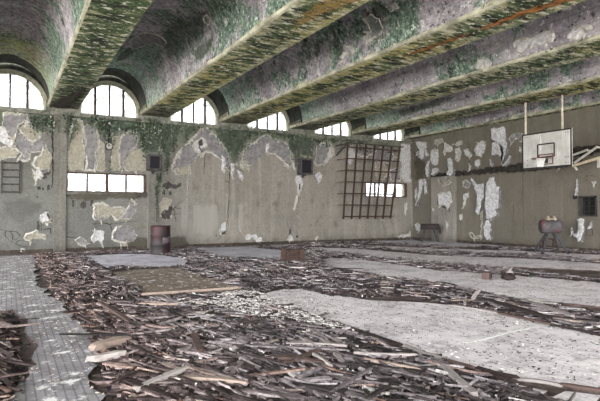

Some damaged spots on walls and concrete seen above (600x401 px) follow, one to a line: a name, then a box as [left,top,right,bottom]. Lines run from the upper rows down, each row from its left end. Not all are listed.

rust [480,0,573,30]
rust [402,34,466,58]
peeling [0,111,53,198]
peeling [20,210,52,252]
peeling [72,198,138,250]
peeling [67,118,146,174]
peeling [159,181,181,220]
peeling [171,124,303,212]
peeling [348,126,523,242]
peeling [570,218,593,242]